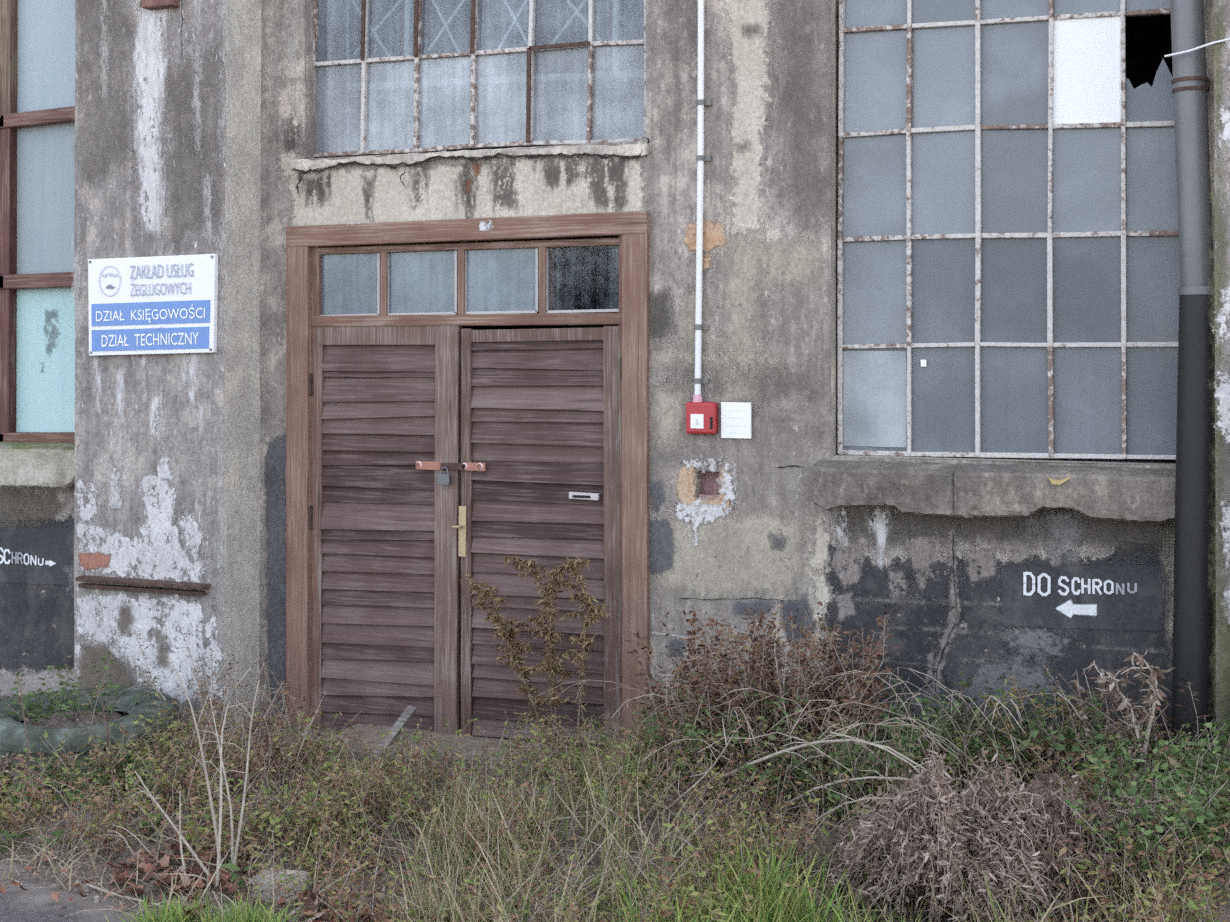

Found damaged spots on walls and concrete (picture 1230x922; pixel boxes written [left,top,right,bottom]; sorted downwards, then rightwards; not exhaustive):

rust [526,41,590,143]
leakage [298,173,331,204]
leakage [363,175,376,218]
leakage [413,165,430,202]
leakage [459,160,478,219]
leakage [490,155,518,210]
leakage [543,156,626,211]
flaking render [651,0,818,402]
flaking render [654,389,685,446]
peeling [0,444,226,705]
peeling [649,463,1174,775]